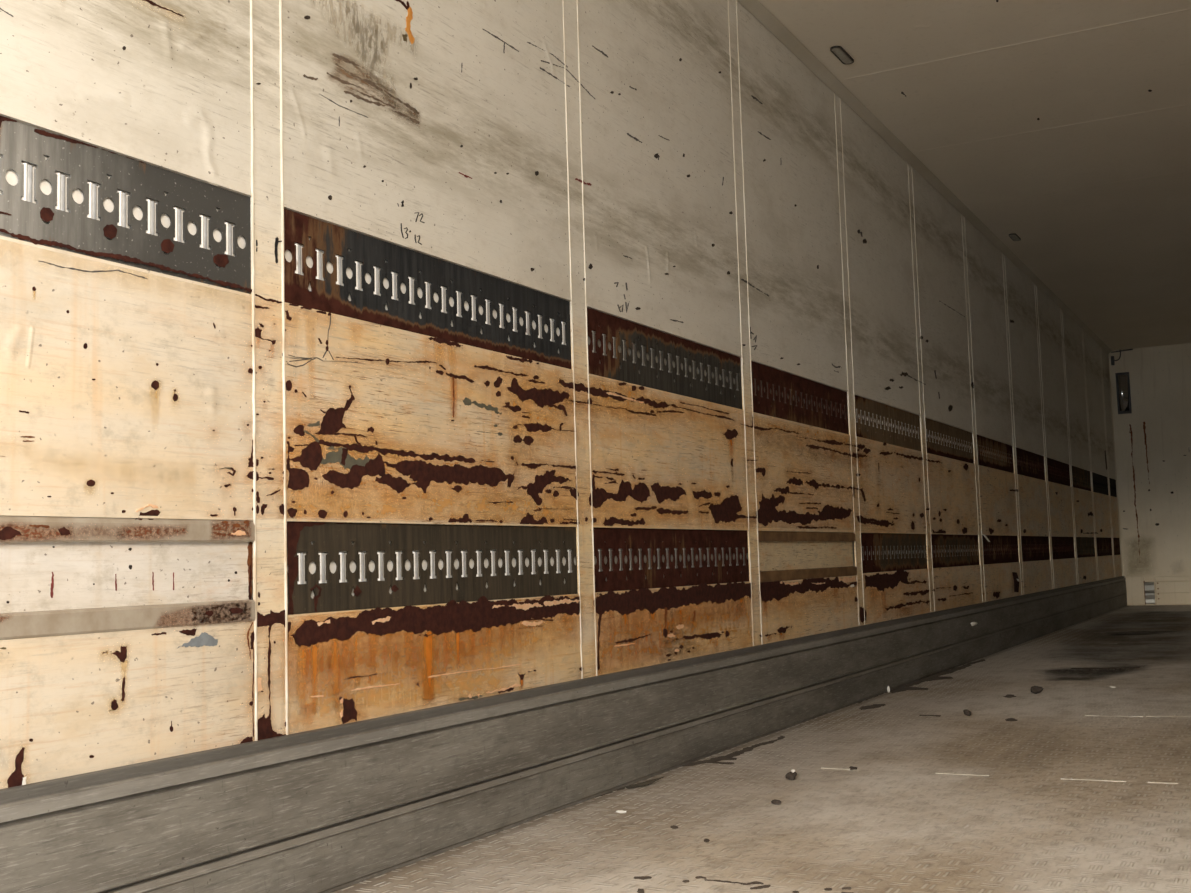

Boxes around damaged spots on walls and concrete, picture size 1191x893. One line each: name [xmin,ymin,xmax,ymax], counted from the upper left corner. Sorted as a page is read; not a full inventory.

corrosion [395,0,415,44]
corrosion [34,129,145,163]
corrosion [40,207,54,222]
corrosion [103,224,117,239]
corrosion [0,229,331,352]
corrosion [429,337,463,347]
peeling [463,397,503,436]
corrosion [1129,422,1150,561]
corrosion [0,524,103,540]
corrosion [120,504,186,538]
corrosion [160,356,973,744]